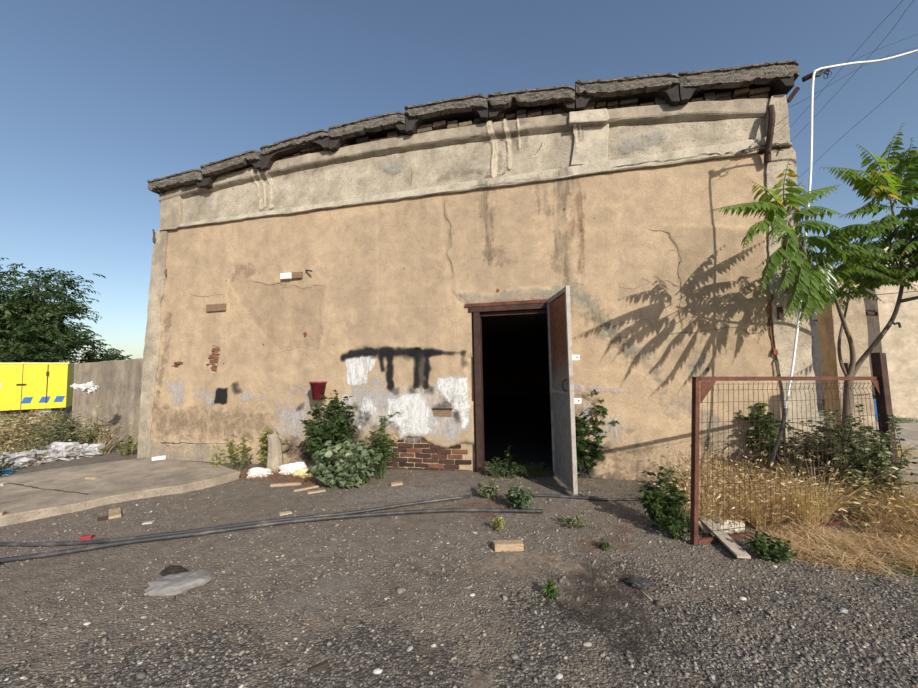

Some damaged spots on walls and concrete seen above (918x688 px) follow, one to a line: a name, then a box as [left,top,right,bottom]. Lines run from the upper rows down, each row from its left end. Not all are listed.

crack [620,229,779,376]
peeling [358,396,377,430]
flaking render [384,437,472,472]